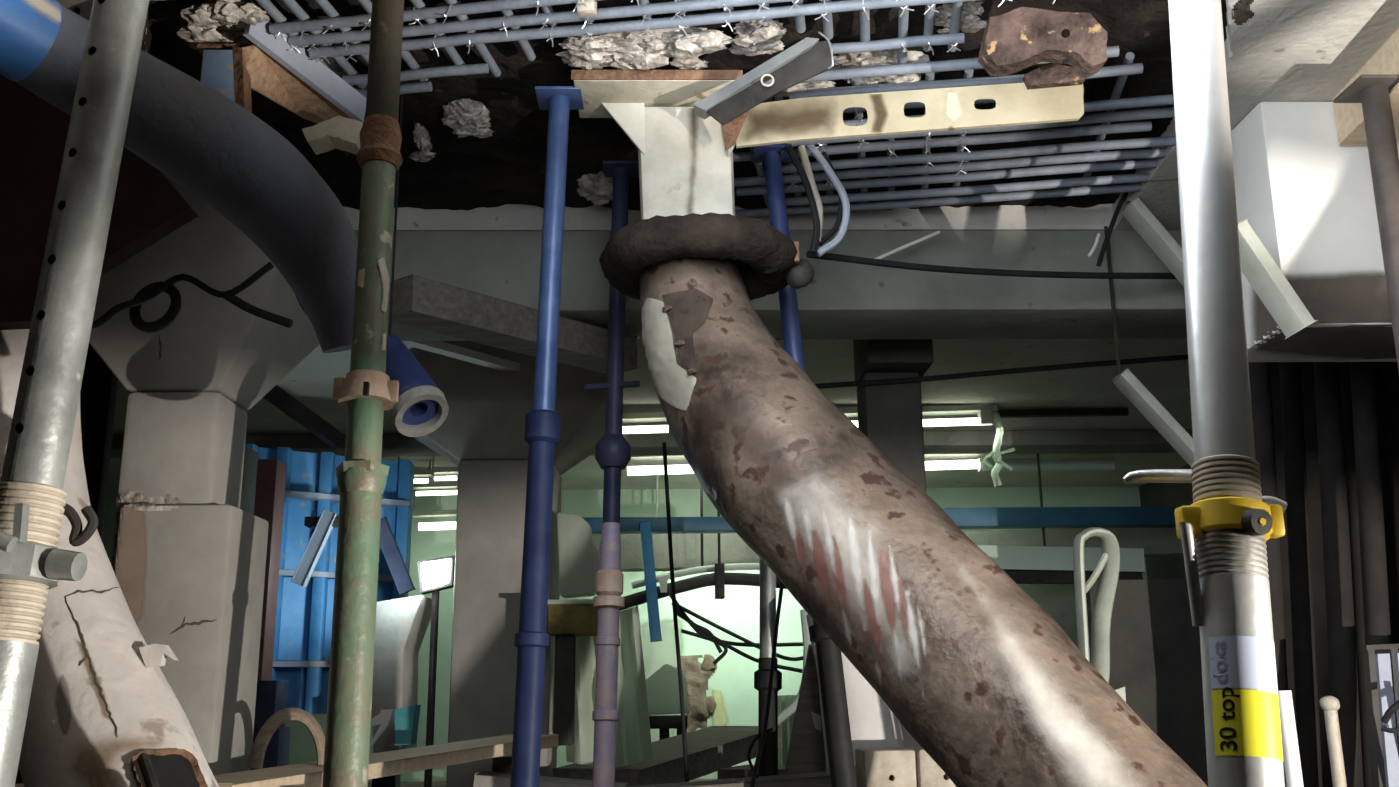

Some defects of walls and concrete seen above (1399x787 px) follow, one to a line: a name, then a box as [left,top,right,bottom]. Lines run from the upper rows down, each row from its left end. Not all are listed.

spalling [148,0,372,92]
spalling [251,91,362,210]
spalling [394,0,1174,211]
corrosion [978,7,1108,90]
crack [65,587,118,737]
crack [171,616,217,634]